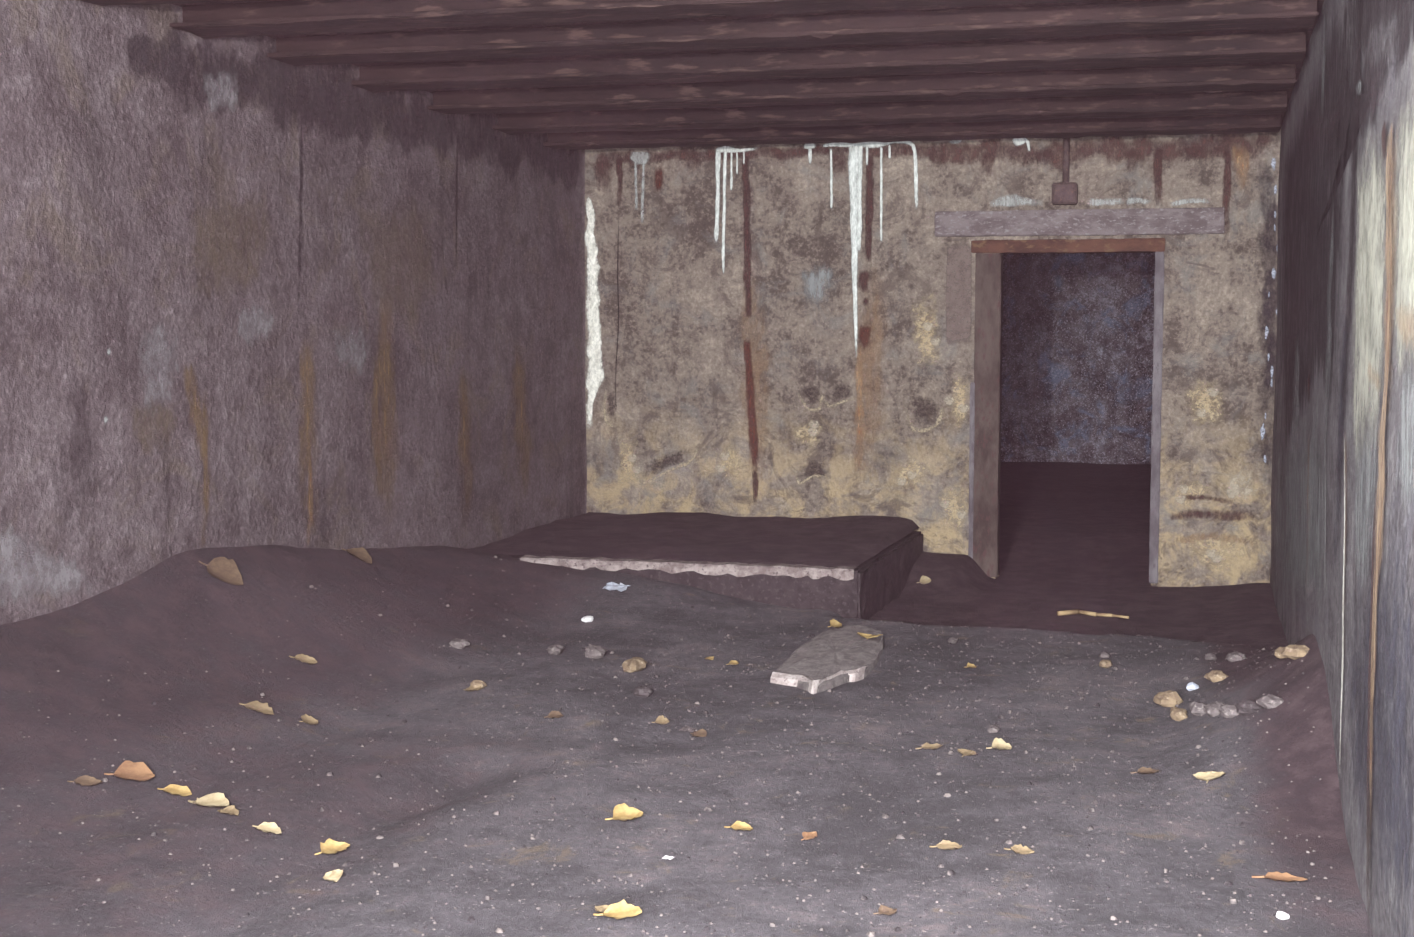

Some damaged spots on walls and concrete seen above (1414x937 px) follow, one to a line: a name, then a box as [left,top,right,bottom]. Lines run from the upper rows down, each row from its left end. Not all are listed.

damp [585,198,604,424]
damp [128,28,1269,347]
corrosion [742,157,751,316]
corrosion [744,342,758,499]
corrosion [856,327,871,442]
corrosion [859,156,874,304]
corrosion [1367,122,1392,885]